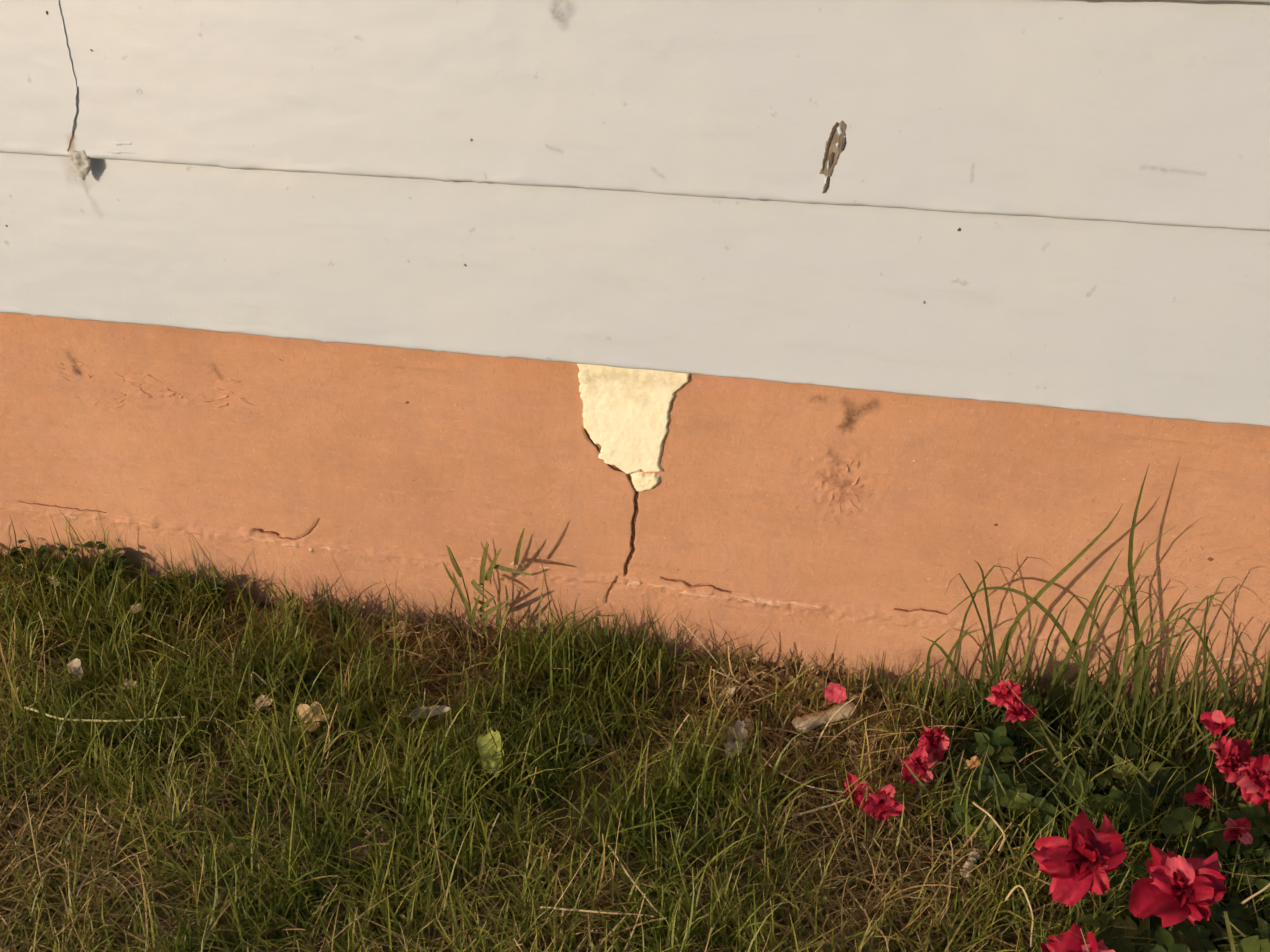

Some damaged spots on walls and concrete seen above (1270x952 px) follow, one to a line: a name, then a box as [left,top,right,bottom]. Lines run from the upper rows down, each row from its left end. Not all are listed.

crack [59,2,78,152]
peeling [819,120,847,193]
spalling [577,364,691,492]
crack [584,429,638,603]
crack [662,577,731,593]